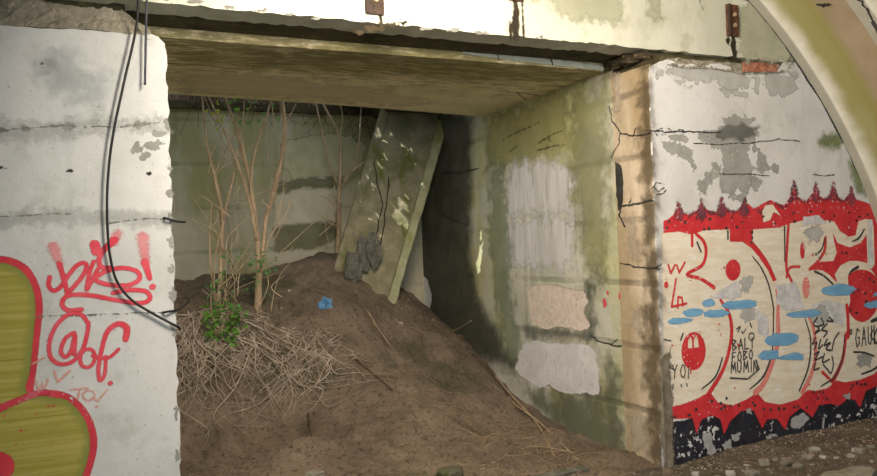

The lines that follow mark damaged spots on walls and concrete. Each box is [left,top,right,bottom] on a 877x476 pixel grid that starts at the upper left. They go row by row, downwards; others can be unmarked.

corrosion [509,1,525,41]
crack [857,0,877,33]
corrosion [726,36,737,60]
peeling [655,58,799,98]
crack [0,121,159,133]
peeling [662,114,779,202]
crack [619,182,666,207]
leakage [525,60,664,466]